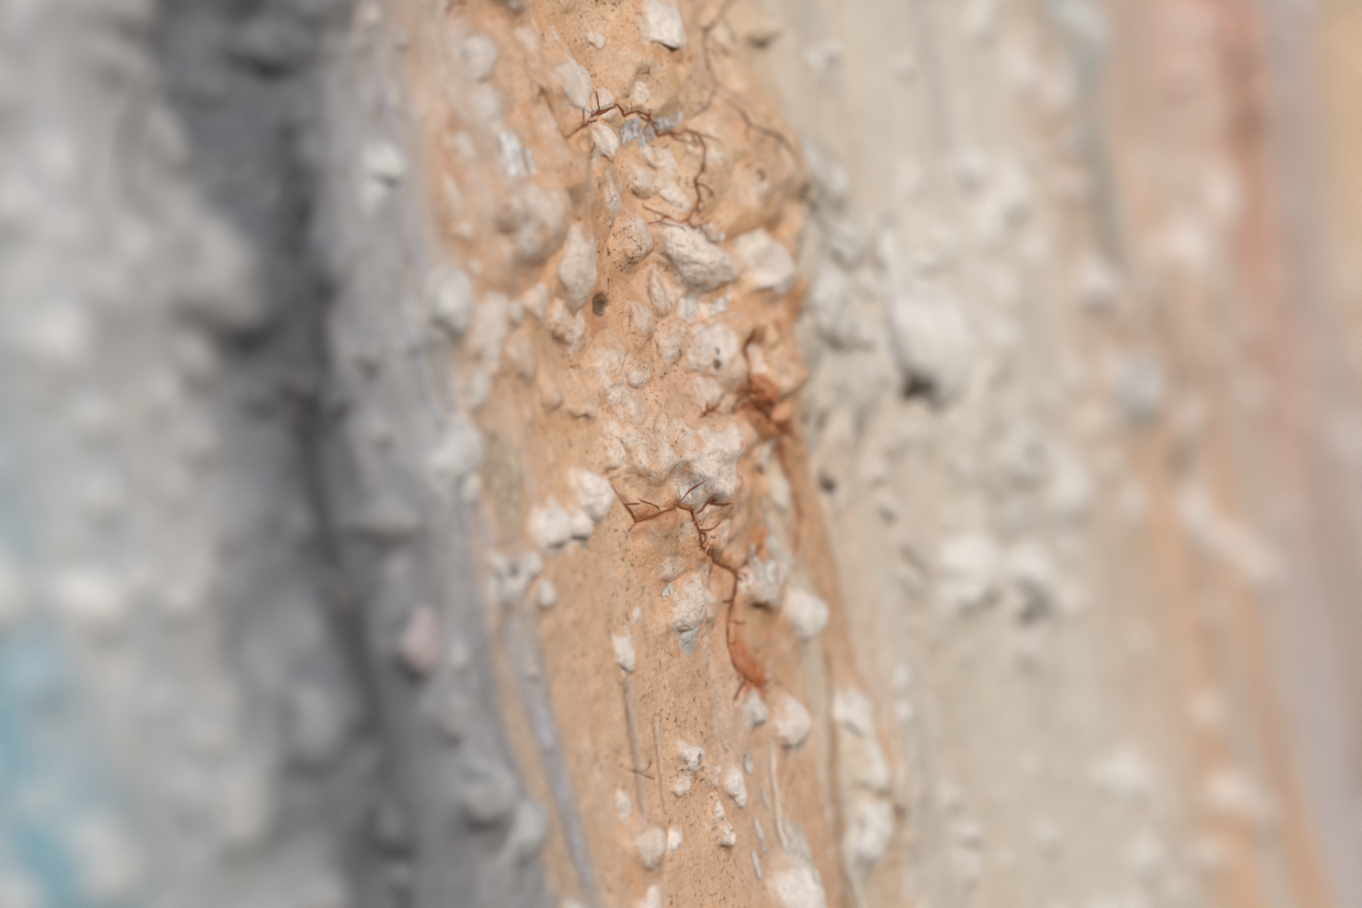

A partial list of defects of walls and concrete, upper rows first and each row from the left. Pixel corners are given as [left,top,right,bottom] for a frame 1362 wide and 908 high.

crack [529,0,859,271]
crack [700,328,810,558]
crack [612,480,772,699]